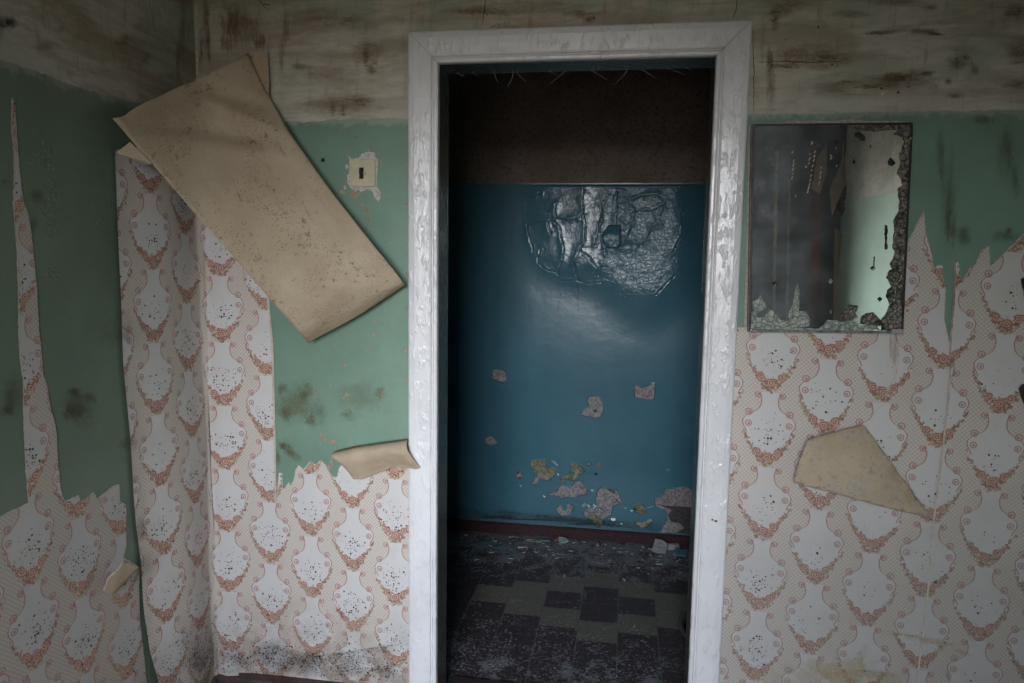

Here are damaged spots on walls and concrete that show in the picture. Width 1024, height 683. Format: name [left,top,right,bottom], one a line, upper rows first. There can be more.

flaking render [324,127,382,227]
flaking render [744,124,753,327]
peeling [580,395,604,419]
peeling [634,383,656,401]
spalling [516,458,692,535]